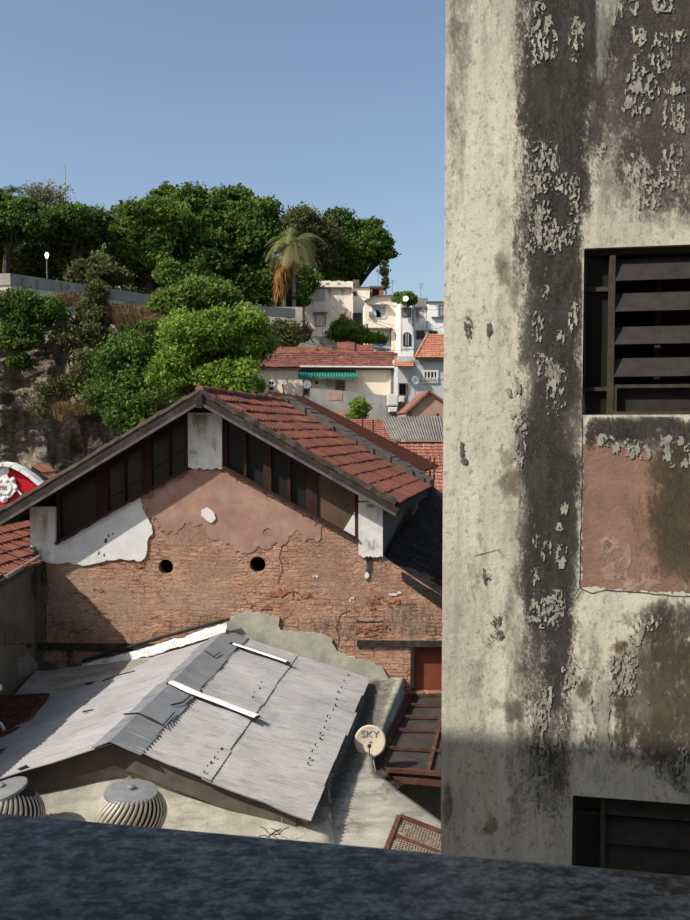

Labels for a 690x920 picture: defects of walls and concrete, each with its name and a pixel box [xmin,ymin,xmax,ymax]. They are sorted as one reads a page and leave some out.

peeling [524,0,585,68]
peeling [524,141,581,255]
leakage [496,0,690,810]
peeling [556,502,569,532]
flaking render [579,434,690,594]
flaking render [20,469,327,671]
peeling [225,588,390,678]
spalling [367,591,401,610]
peeling [527,534,567,629]